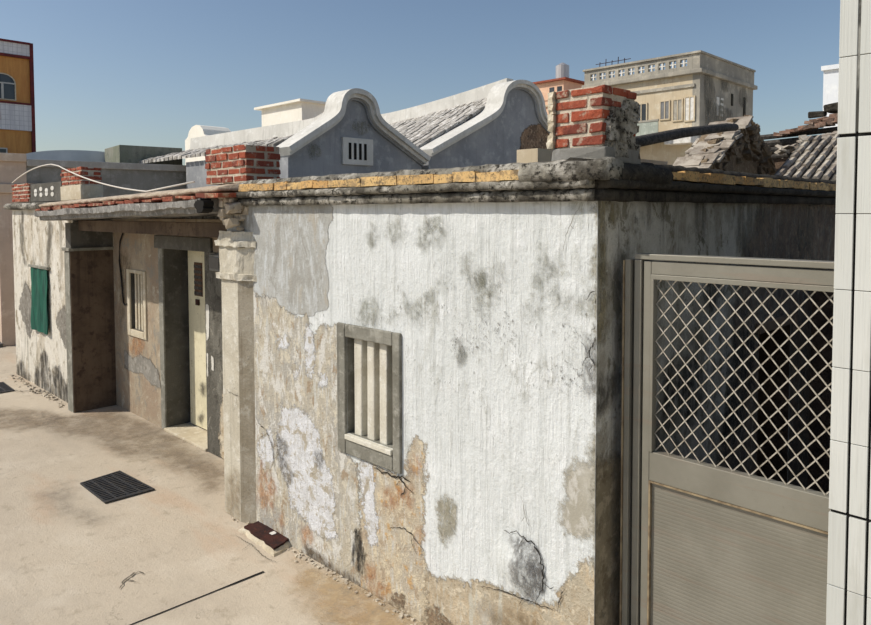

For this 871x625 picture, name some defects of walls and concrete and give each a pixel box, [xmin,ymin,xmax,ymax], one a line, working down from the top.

damp [17,349,68,403]
peeling [227,205,596,625]
crack [376,468,412,495]
crack [482,501,563,611]